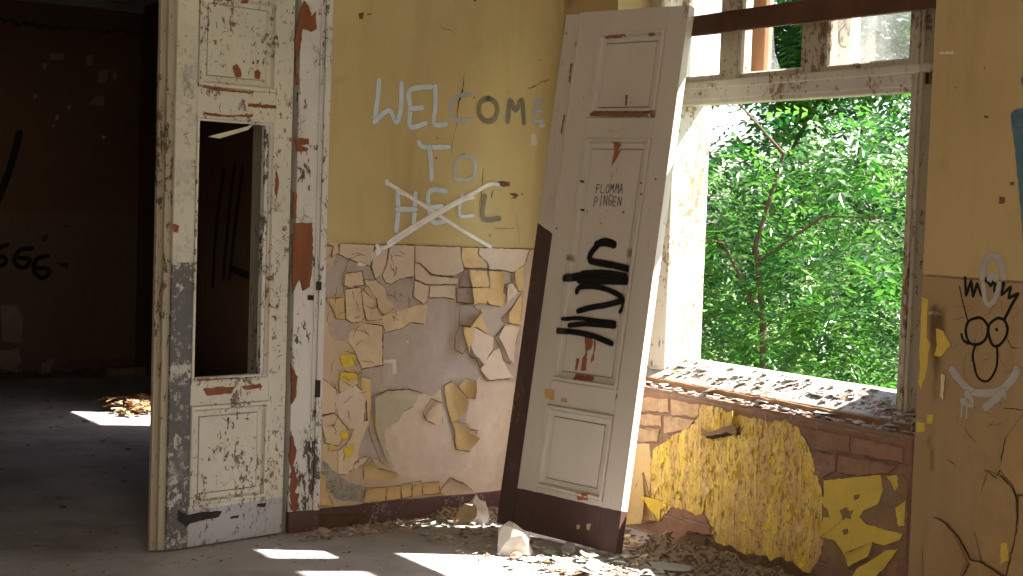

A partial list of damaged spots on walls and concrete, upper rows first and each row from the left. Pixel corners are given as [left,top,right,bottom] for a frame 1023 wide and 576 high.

peeling [288,431,299,512]
flaking render [290,192,530,525]
peeling [626,397,908,576]
crack [934,298,1023,576]